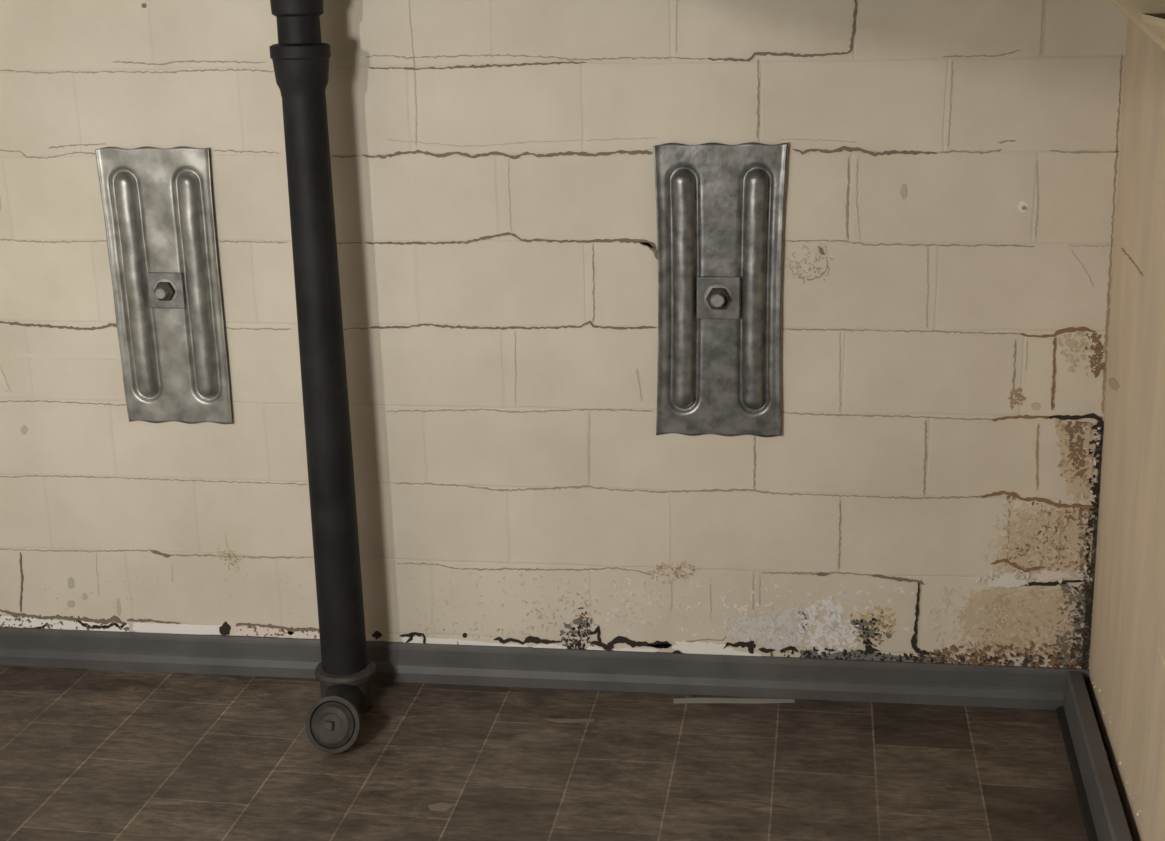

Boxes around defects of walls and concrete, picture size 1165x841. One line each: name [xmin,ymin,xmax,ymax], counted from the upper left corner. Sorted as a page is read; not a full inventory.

crack [0,60,274,74]
crack [0,143,105,159]
crack [213,148,279,156]
crack [0,237,107,245]
crack [217,238,287,246]
crack [0,321,117,330]
crack [331,0,1143,657]
leakage [1058,331,1119,391]
leakage [1008,387,1026,408]
leakage [390,416,1104,669]